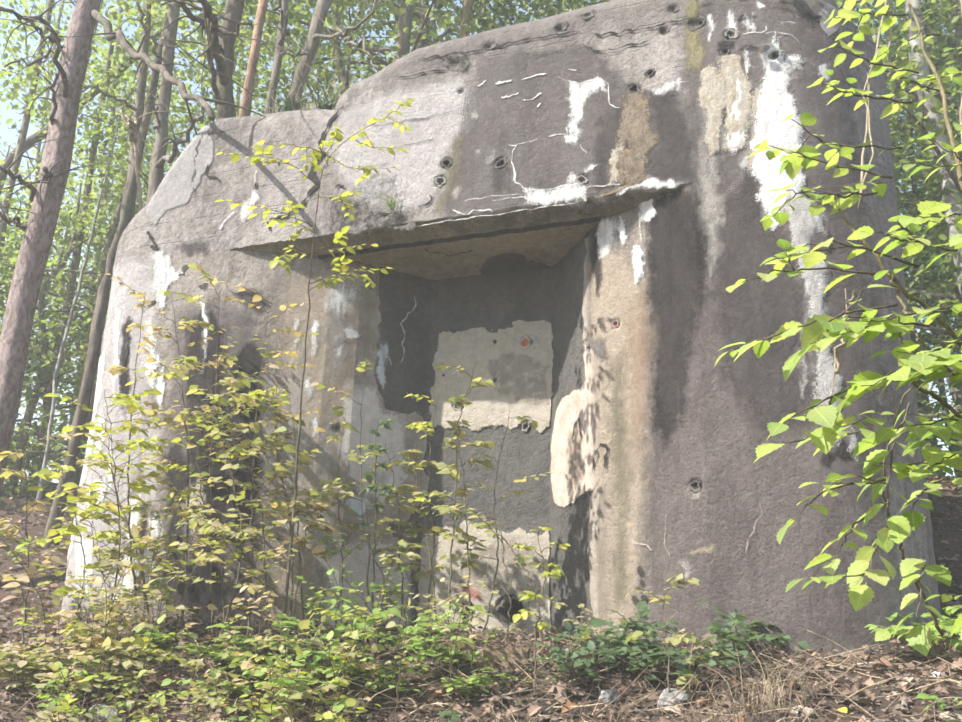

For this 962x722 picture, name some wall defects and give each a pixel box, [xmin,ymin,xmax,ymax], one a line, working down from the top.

water stain [63,231,264,610]
crack [191,130,225,195]
water stain [269,265,371,631]
peeling [324,236,607,635]
crack [266,18,688,231]
water stain [329,0,891,655]